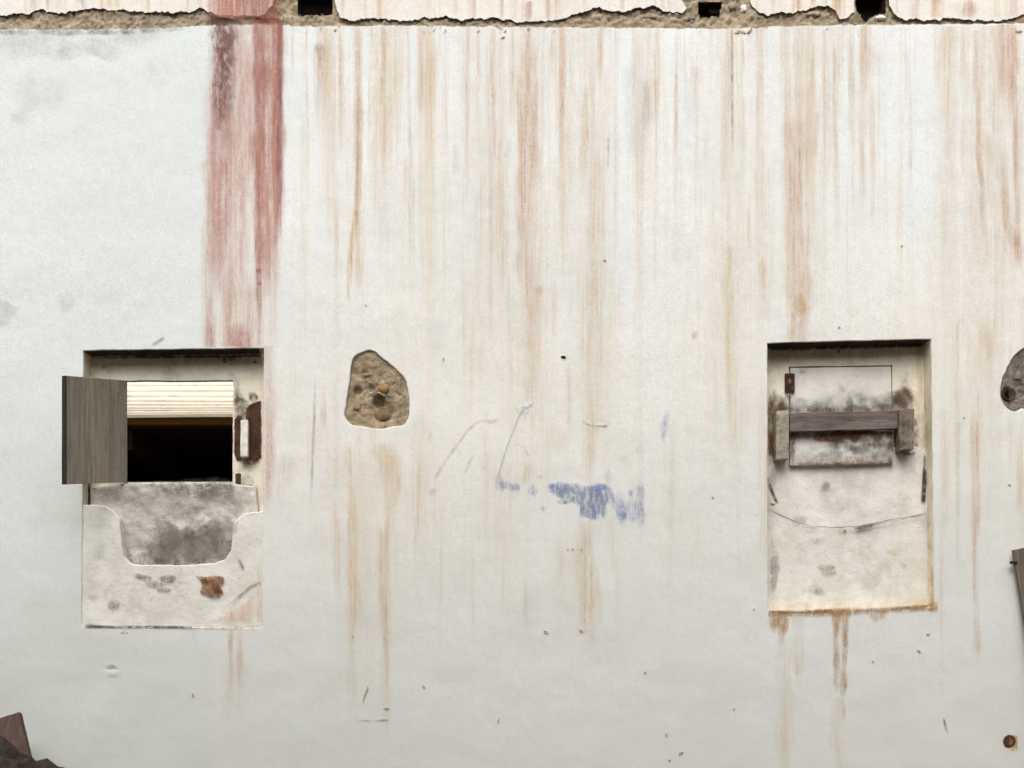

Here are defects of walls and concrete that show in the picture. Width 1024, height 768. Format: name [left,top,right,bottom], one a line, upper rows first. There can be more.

flaking render [0,0,1024,39]
rust [211,0,282,298]
flaking render [344,350,410,429]
damp [769,394,905,412]
flaking render [1000,348,1024,412]
crack [840,523,881,532]
rust [197,576,224,597]
rust [772,608,869,646]